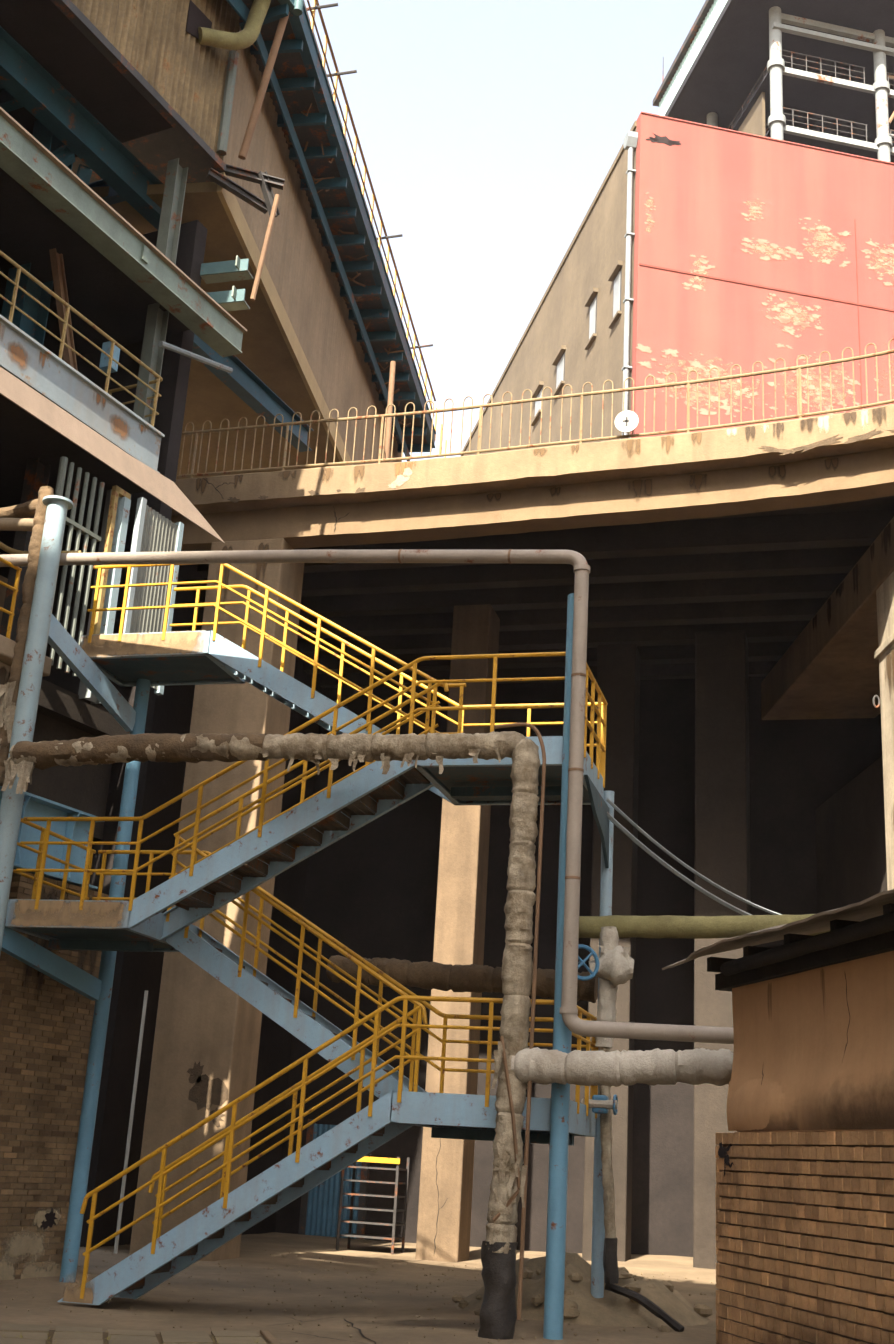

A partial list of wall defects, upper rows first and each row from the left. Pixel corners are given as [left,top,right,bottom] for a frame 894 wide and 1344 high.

peeling [682,254,715,291]
peeling [741,217,894,286]
corrosion [10,343,46,368]
peeling [635,293,894,417]
corrosion [96,394,146,438]
water stain [886,650,894,689]
crack [434,1138,448,1253]